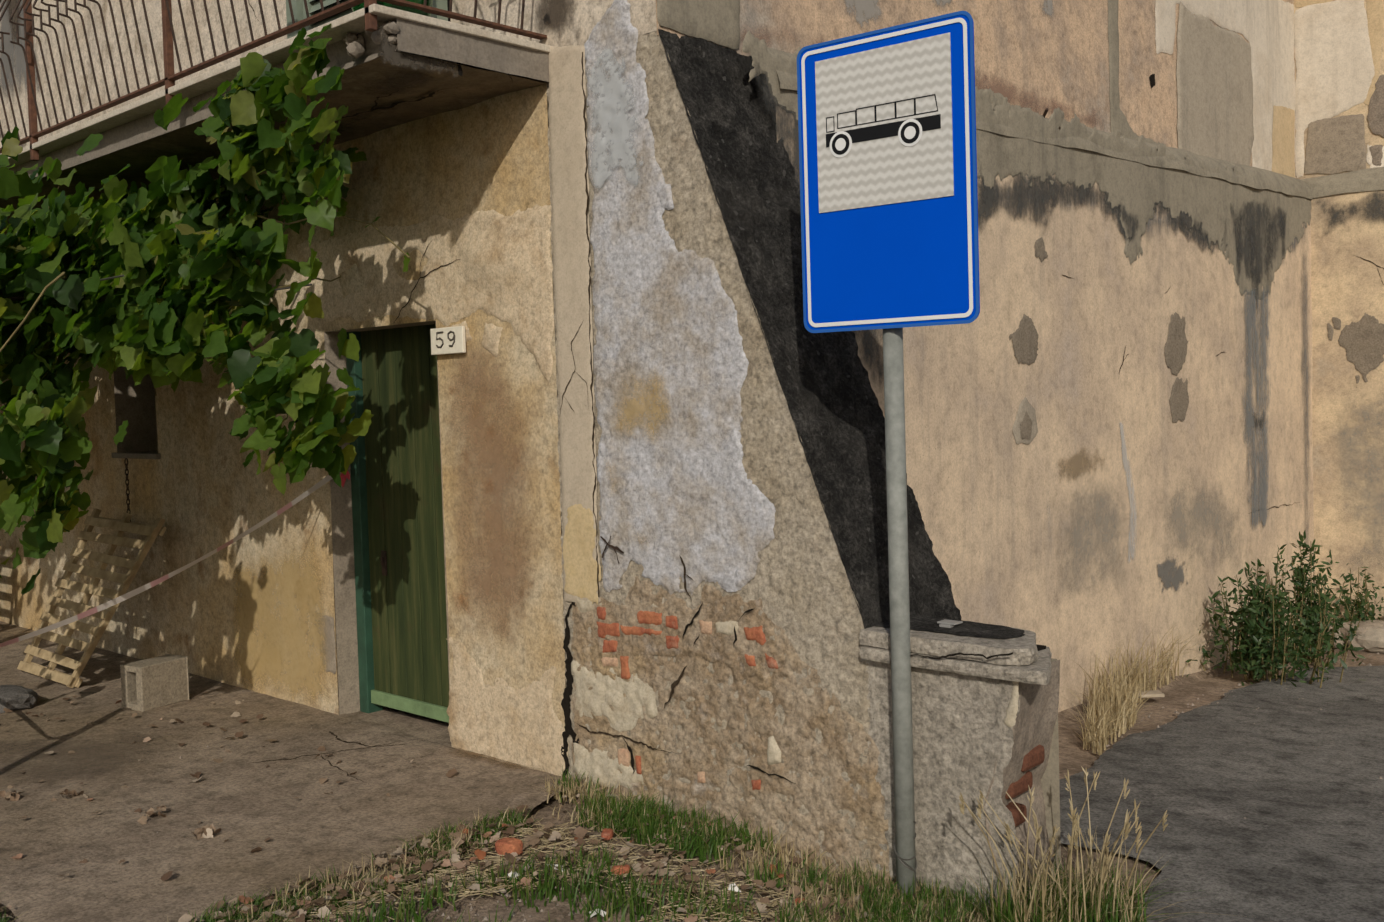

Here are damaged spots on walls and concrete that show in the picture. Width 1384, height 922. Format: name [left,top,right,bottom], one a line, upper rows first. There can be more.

damp [977,173,1219,252]
damp [1323,192,1384,227]
spalling [1009,314,1039,365]
spalling [1164,312,1189,423]
damp [1232,203,1298,529]
spalling [1327,313,1384,388]
crack [558,52,681,777]
peeling [571,0,890,883]
damp [1061,452,1092,477]
crack [664,555,703,708]
crack [733,608,755,645]
crack [747,765,796,784]